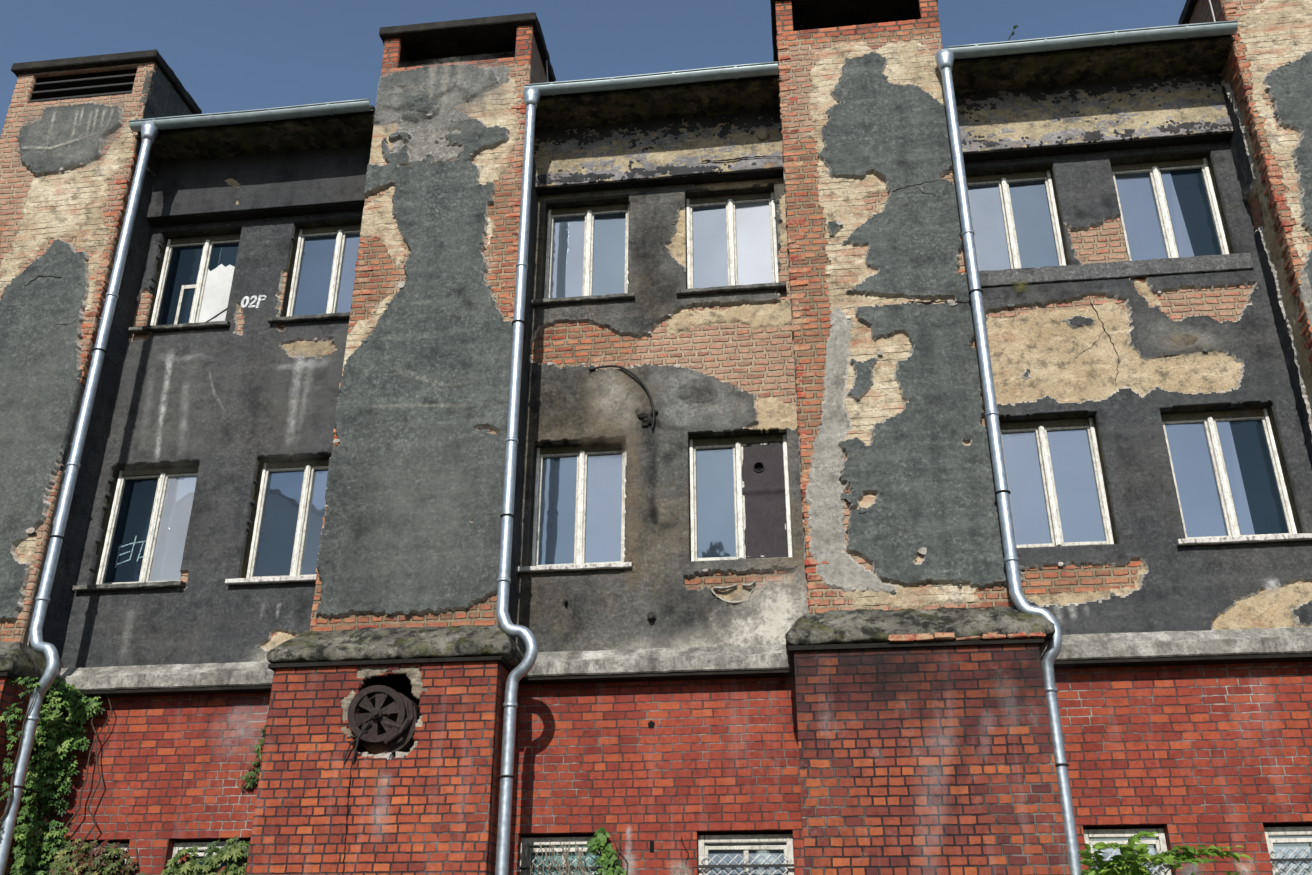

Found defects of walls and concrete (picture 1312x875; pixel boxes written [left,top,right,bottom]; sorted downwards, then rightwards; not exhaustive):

flaking render [0,62,157,645]
flaking render [273,120,411,404]
flaking render [452,0,1312,614]
flaking render [255,486,499,651]
flaking render [888,632,1046,643]
flaking render [1211,578,1312,630]